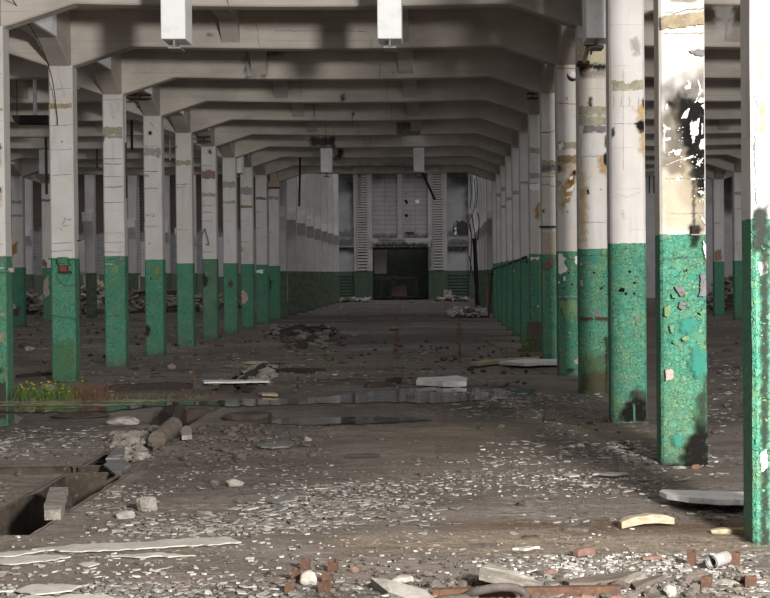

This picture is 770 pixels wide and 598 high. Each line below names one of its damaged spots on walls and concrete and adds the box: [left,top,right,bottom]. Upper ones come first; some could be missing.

damp [310,136,343,160]
rust [560,164,587,235]
peeling [662,80,705,202]
peeling [558,249,645,365]
peeling [663,240,706,389]